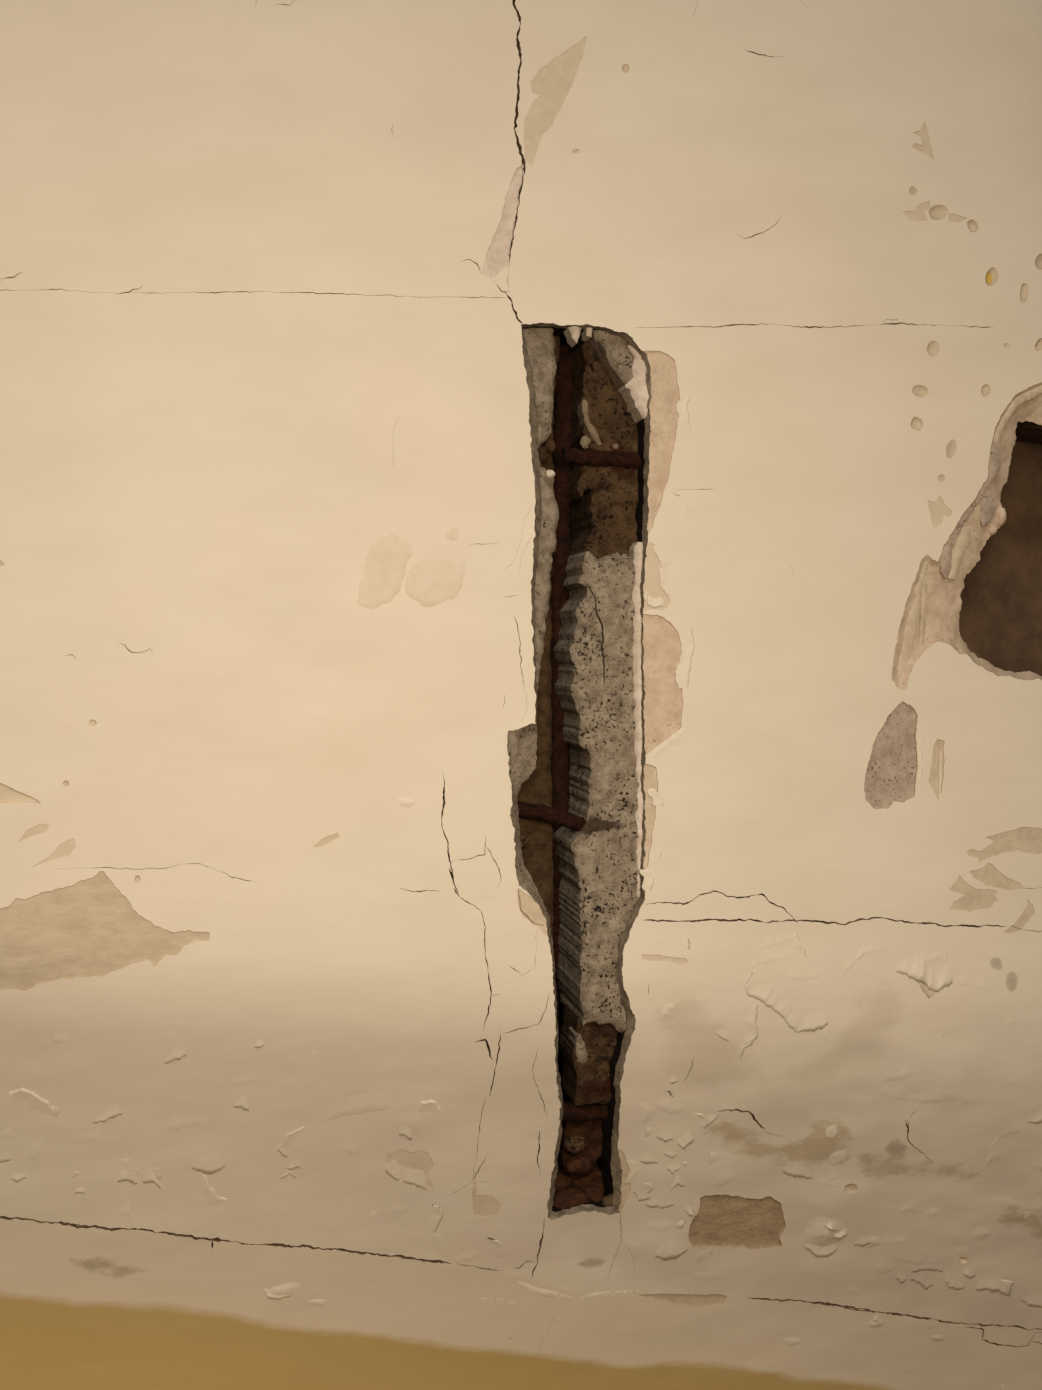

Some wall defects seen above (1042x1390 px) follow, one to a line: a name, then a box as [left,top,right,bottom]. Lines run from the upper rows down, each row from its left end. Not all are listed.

crack [462,0,526,326]
peeling [482,36,587,279]
spalling [864,383,1042,809]
peeling [0,871,210,991]
crack [401,774,549,1194]
spalling [507,323,688,1220]
rust [582,816,619,836]
crack [640,890,1041,932]
peeling [950,827,1042,933]
crack [0,1216,545,1277]
spalling [688,1195,786,1250]
crack [749,1298,1042,1347]